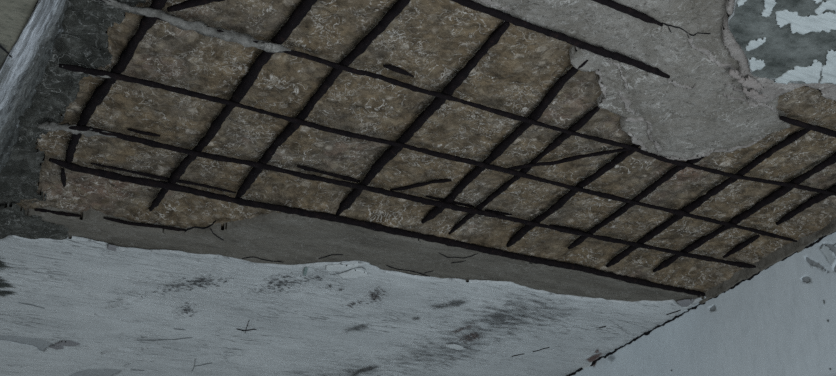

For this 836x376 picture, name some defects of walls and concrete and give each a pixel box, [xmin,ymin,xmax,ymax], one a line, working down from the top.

spalling [0,0,280,240]
spalling [35,64,797,268]
spalling [25,158,836,304]
spalling [99,0,836,196]